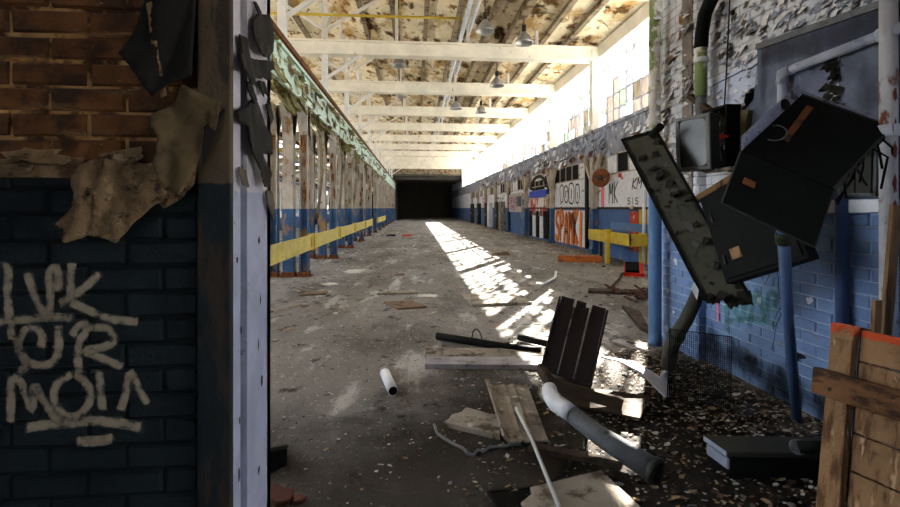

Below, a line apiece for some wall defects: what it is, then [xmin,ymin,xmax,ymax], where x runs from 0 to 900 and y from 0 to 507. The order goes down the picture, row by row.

peeling [597,7,627,27]
peeling [710,0,873,107]
peeling [0,0,387,244]
rust [288,64,384,206]
peeling [479,130,611,204]